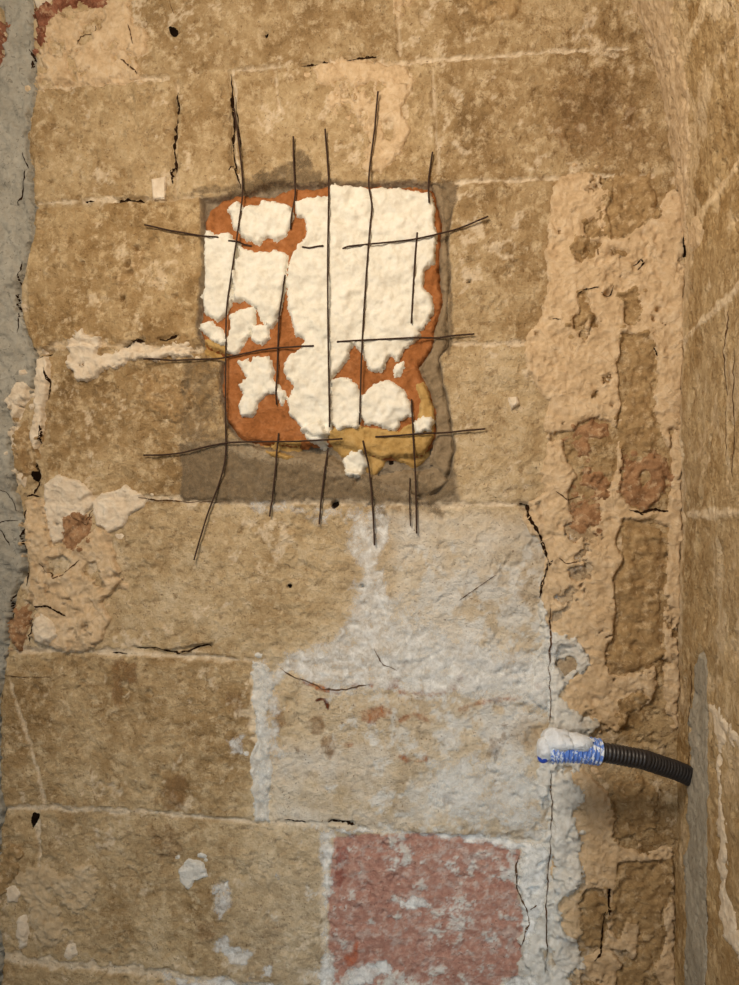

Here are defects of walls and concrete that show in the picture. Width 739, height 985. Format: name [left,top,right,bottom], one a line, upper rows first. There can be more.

crack [170,95,180,183]
crack [228,76,242,189]
peeling [304,57,415,174]
peeling [64,328,200,429]
peeling [522,0,691,738]
peeling [7,474,154,653]
leakage [181,416,560,716]
crack [519,503,577,719]
leakage [320,827,370,903]
leakage [421,757,549,944]
crack [515,771,553,971]
leakage [349,960,392,985]